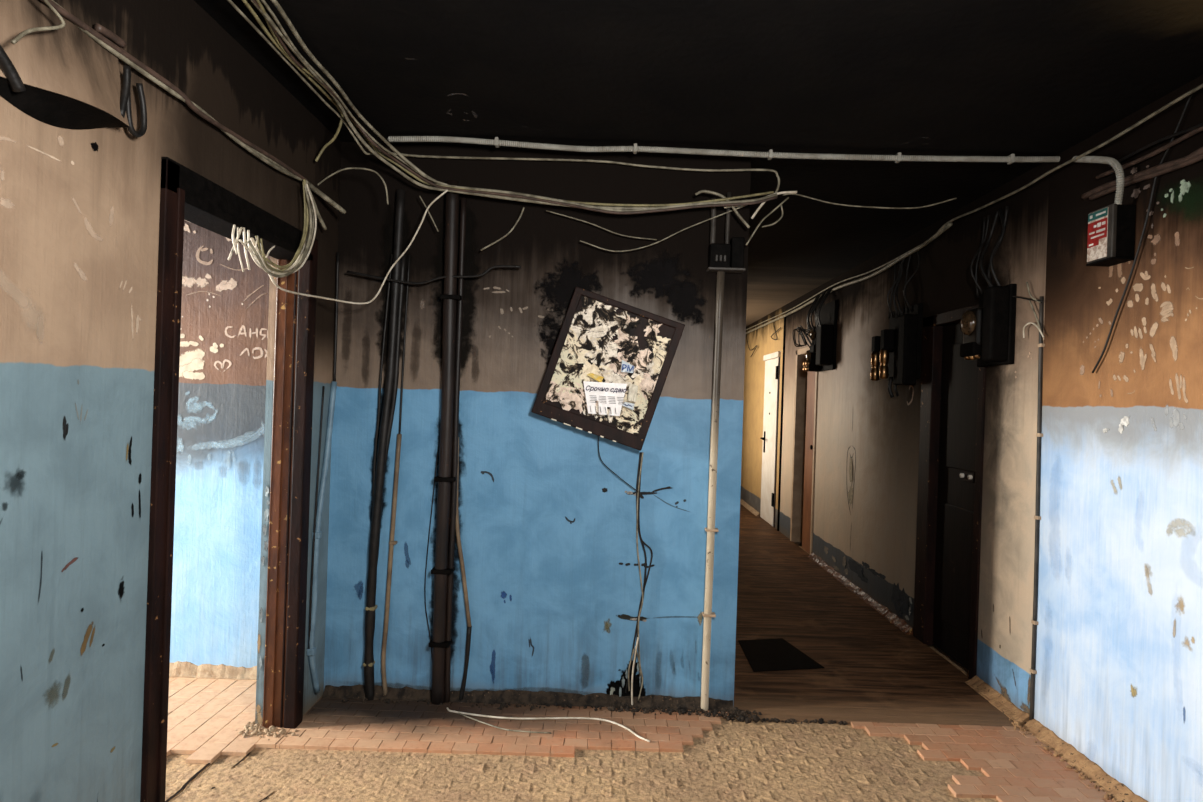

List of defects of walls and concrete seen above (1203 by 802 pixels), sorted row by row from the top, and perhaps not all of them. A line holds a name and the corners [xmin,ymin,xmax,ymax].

peeling [1146,179,1191,229]